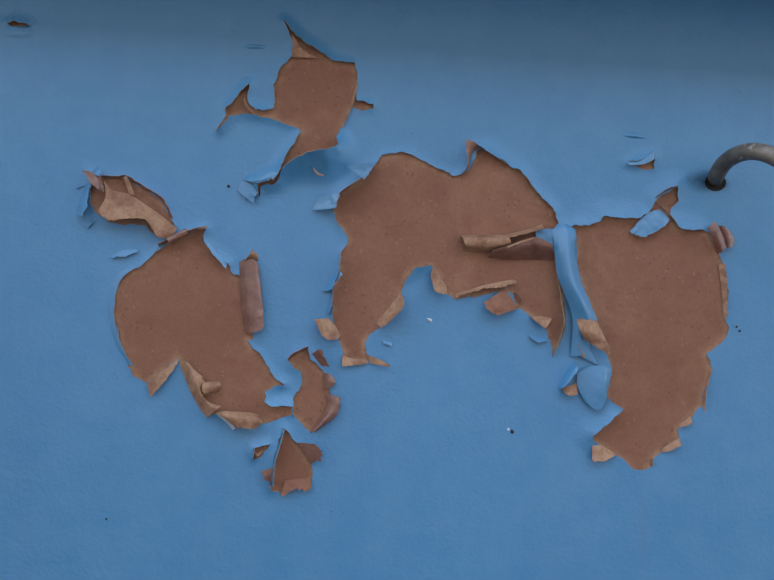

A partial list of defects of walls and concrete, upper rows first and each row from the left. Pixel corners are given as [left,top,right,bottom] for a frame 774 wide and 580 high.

peeling [215,21,374,203]
peeling [75,165,341,433]
peeling [313,139,735,470]
peeling [250,428,323,497]